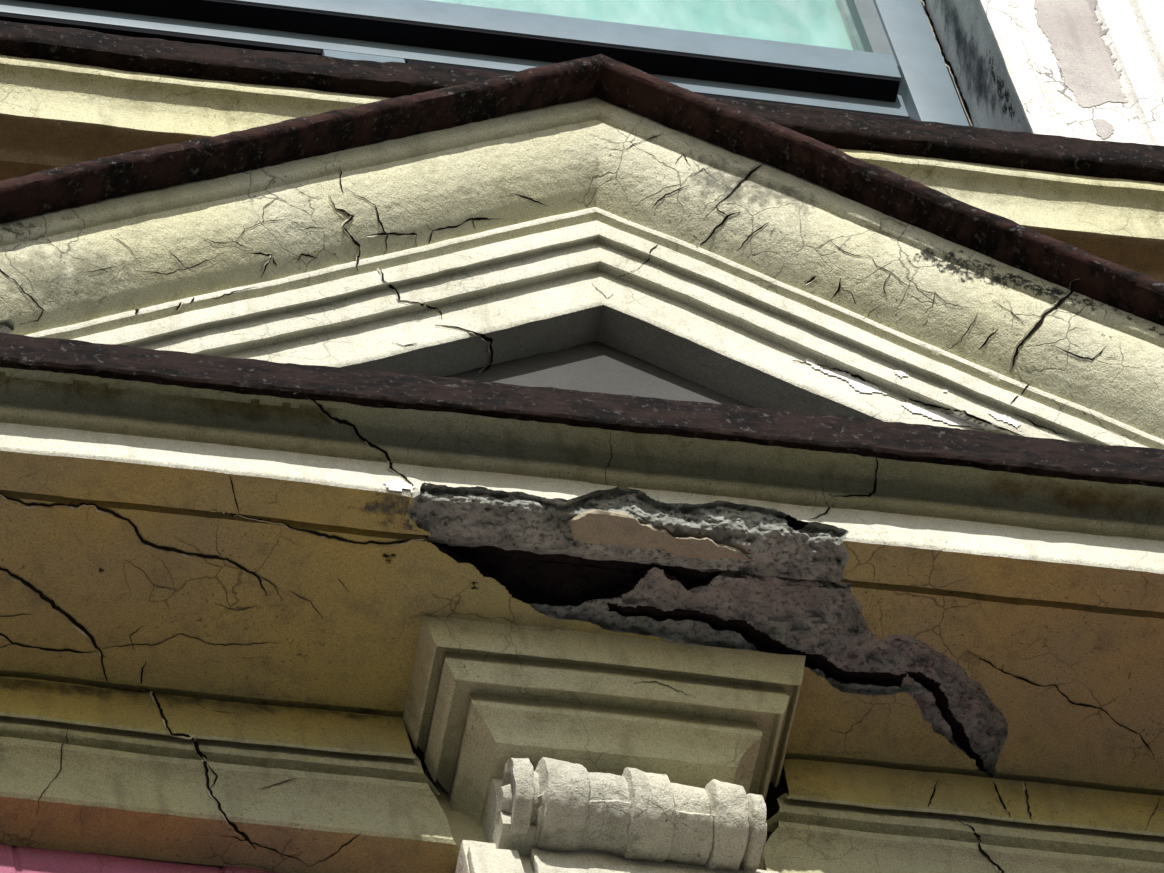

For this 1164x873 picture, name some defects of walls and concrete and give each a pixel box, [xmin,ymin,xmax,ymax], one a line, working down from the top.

leakage [941,0,1019,120]
peeling [1033,0,1128,139]
crack [621,133,774,250]
spalling [0,319,15,334]
crack [0,269,44,324]
crack [87,167,493,375]
crack [793,241,1114,435]
crack [294,393,417,490]
crack [210,475,423,546]
crack [0,493,360,867]
spalling [383,479,1008,778]
crack [967,651,1155,757]